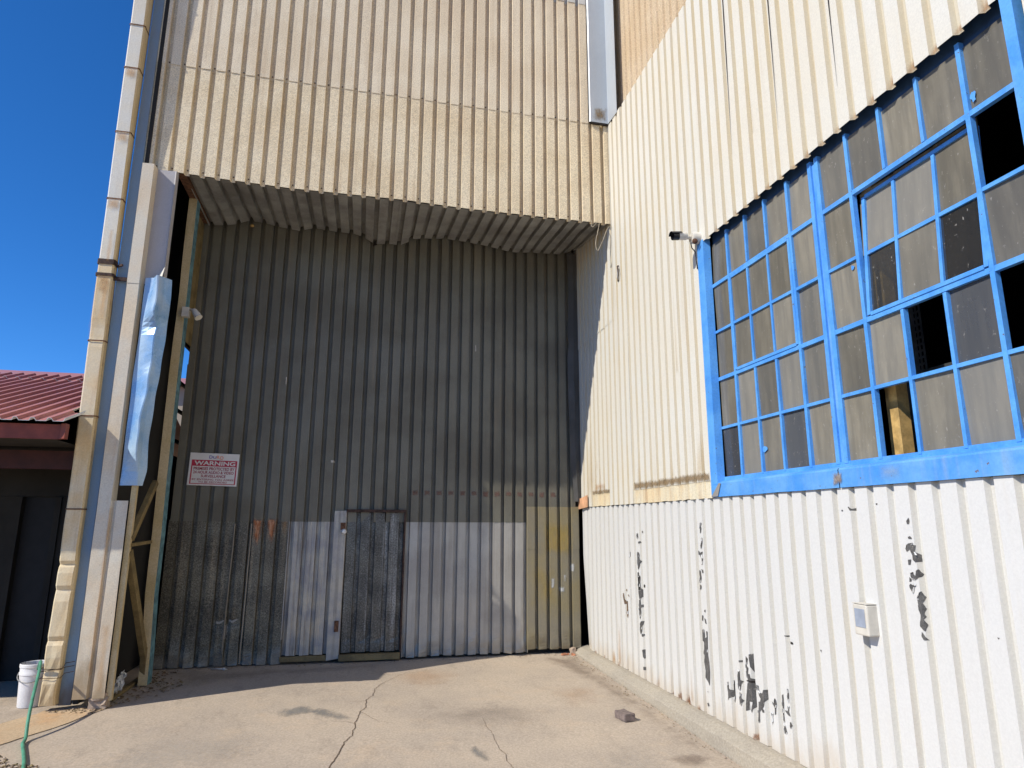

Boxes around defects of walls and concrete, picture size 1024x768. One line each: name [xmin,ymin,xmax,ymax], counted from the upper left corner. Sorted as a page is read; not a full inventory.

damp [634,473,709,488]
rust [254,520,275,541]
peeling [623,531,646,670]
peeling [905,518,929,640]
peeling [702,610,710,685]
crack [329,672,407,768]
peeling [727,654,793,734]